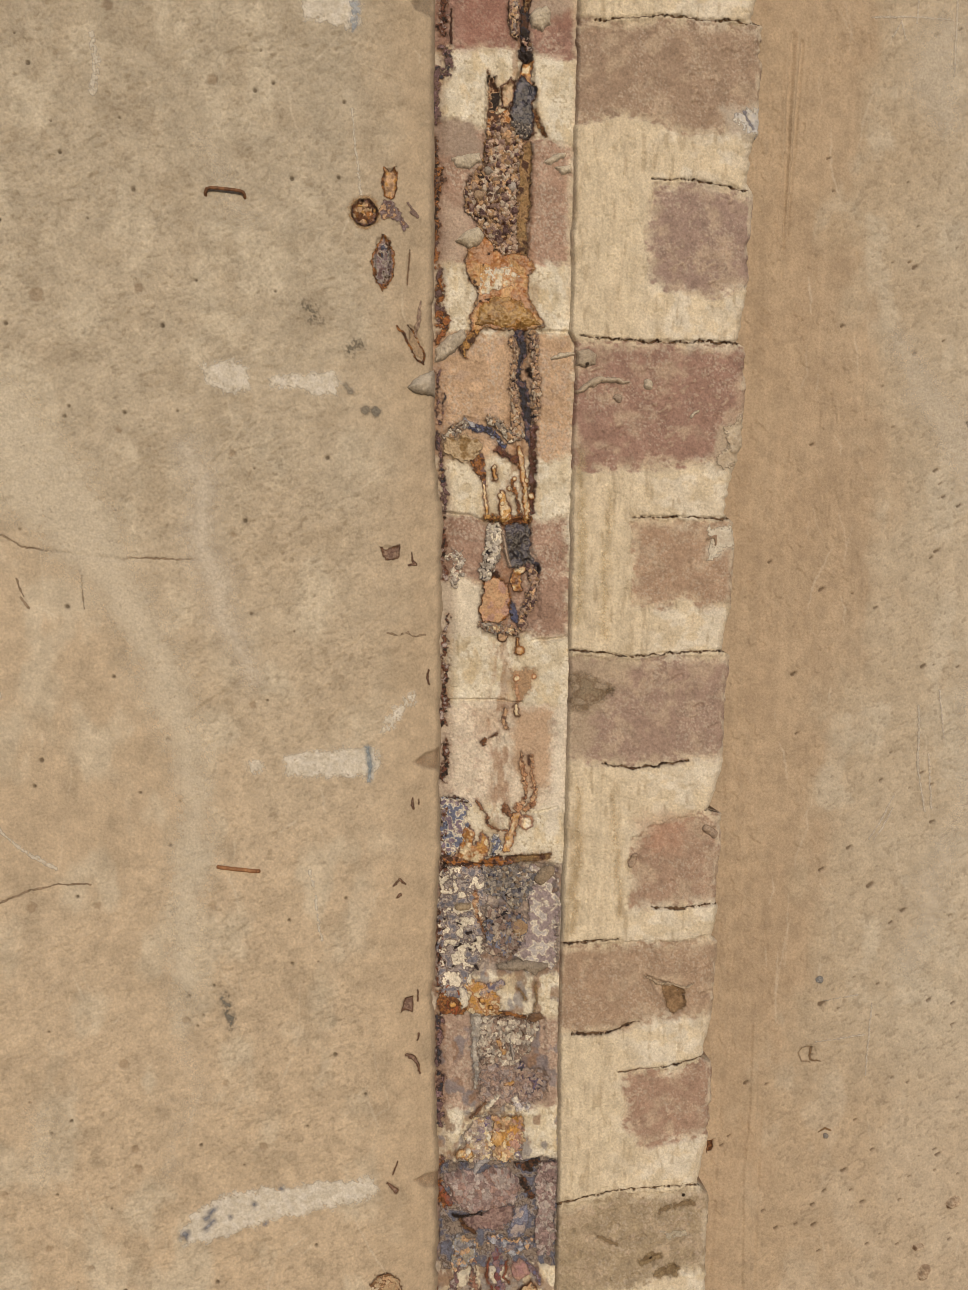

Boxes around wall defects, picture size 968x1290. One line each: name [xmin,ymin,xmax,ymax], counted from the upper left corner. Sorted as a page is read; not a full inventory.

crack [507,0,533,64]
corrosion [487,50,547,140]
corrosion [349,0,454,344]
spalling [464,118,533,256]
corrosion [459,235,545,358]
spalling [442,414,525,462]
crack [0,533,85,609]
crack [121,555,200,563]
spalling [445,522,541,636]
spalling [436,863,562,998]
spalling [439,1013,558,1272]